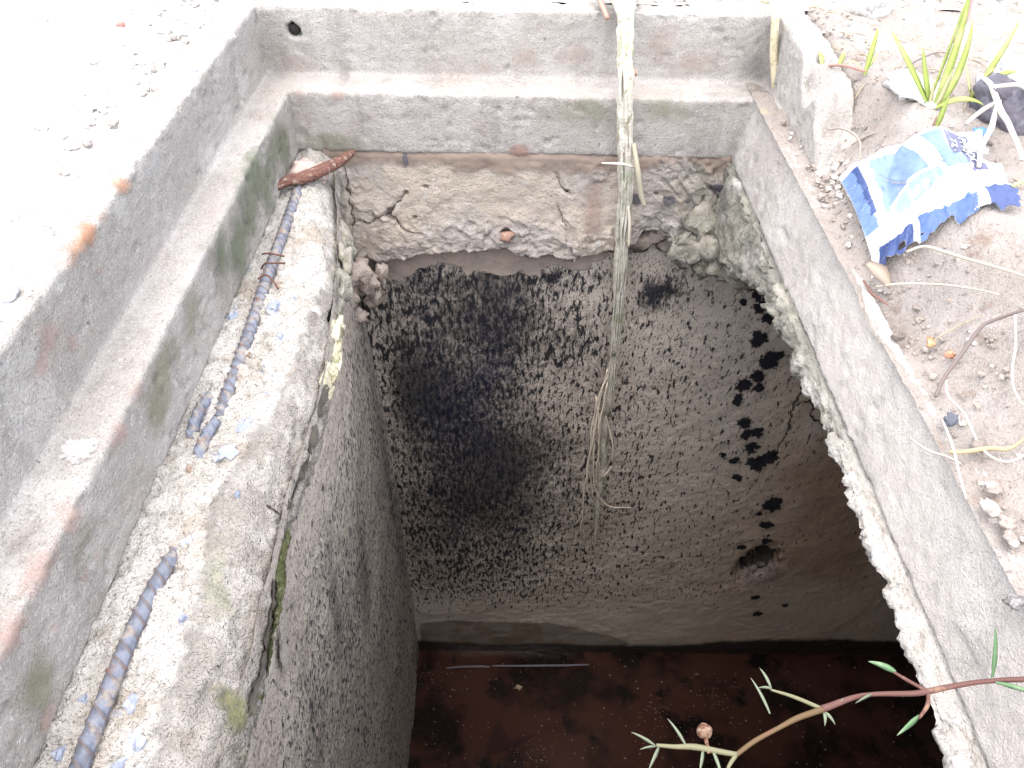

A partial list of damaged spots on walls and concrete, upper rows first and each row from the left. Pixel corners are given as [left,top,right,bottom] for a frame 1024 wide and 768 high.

crack [344,167,414,233]
water stain [632,268,690,316]
water stain [389,269,583,549]
water stain [720,289,785,482]
crack [777,386,823,452]
spalling [33,147,725,768]
water stain [755,497,783,545]
spalling [739,544,782,585]